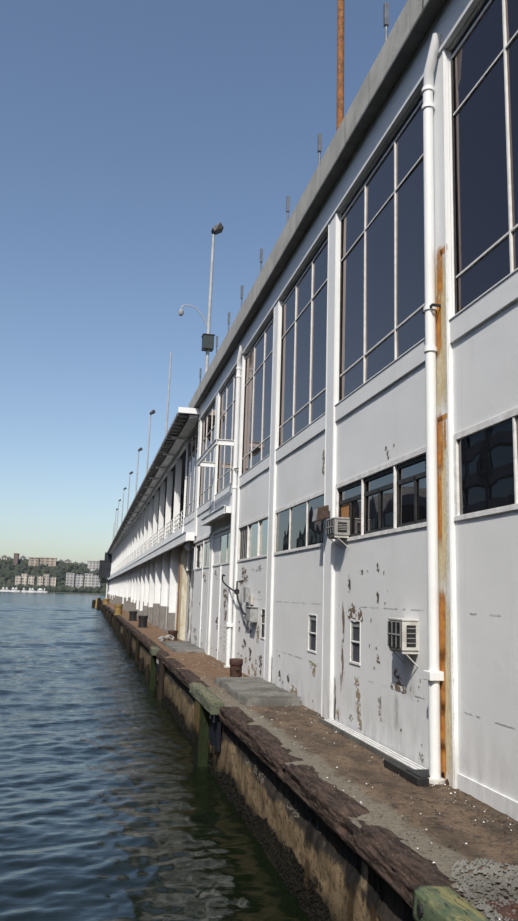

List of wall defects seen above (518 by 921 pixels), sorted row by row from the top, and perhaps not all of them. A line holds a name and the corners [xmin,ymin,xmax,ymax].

corrosion [436,245,447,351]
corrosion [437,413,447,539]
peeling [193,587,227,654]
peeling [238,612,262,677]
peeling [336,677,362,730]
peeling [340,603,372,690]
peeling [390,668,421,693]
corrosion [440,593,449,786]
leakage [344,851,380,921]